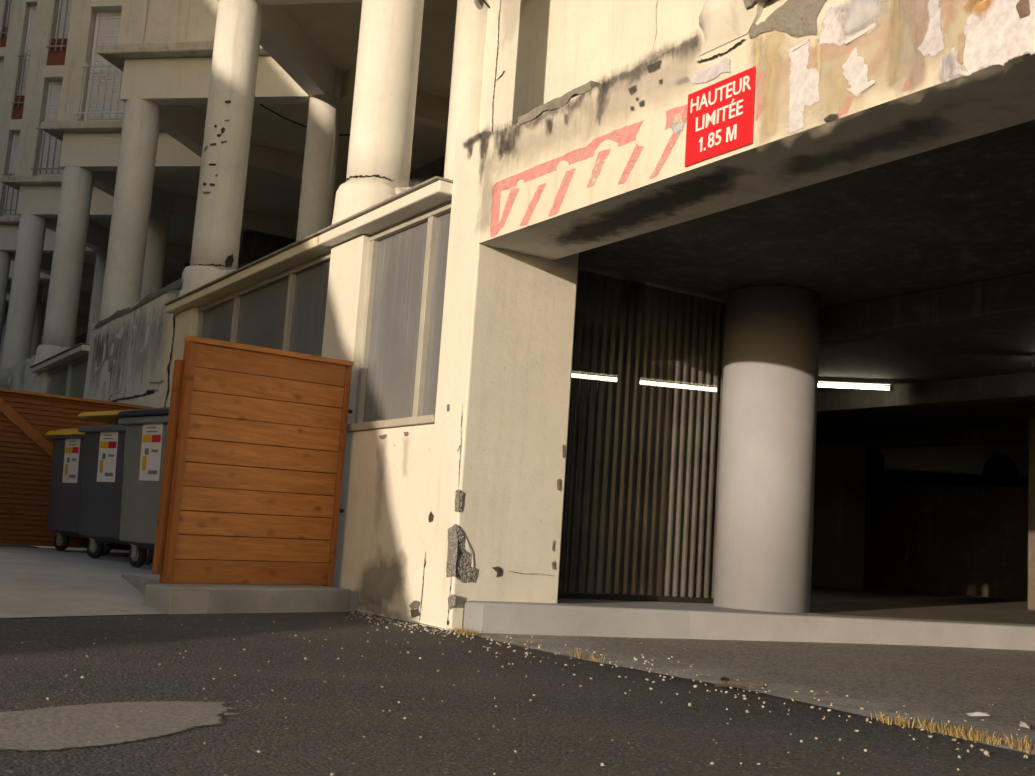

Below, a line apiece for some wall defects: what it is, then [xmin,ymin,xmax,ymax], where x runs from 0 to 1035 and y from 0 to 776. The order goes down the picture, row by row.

damp [594,33,698,123]
peeling [749,0,882,133]
peeling [917,0,1035,82]
rust [968,0,991,14]
damp [464,96,582,173]
crack [109,295,177,407]
spalling [446,489,478,583]